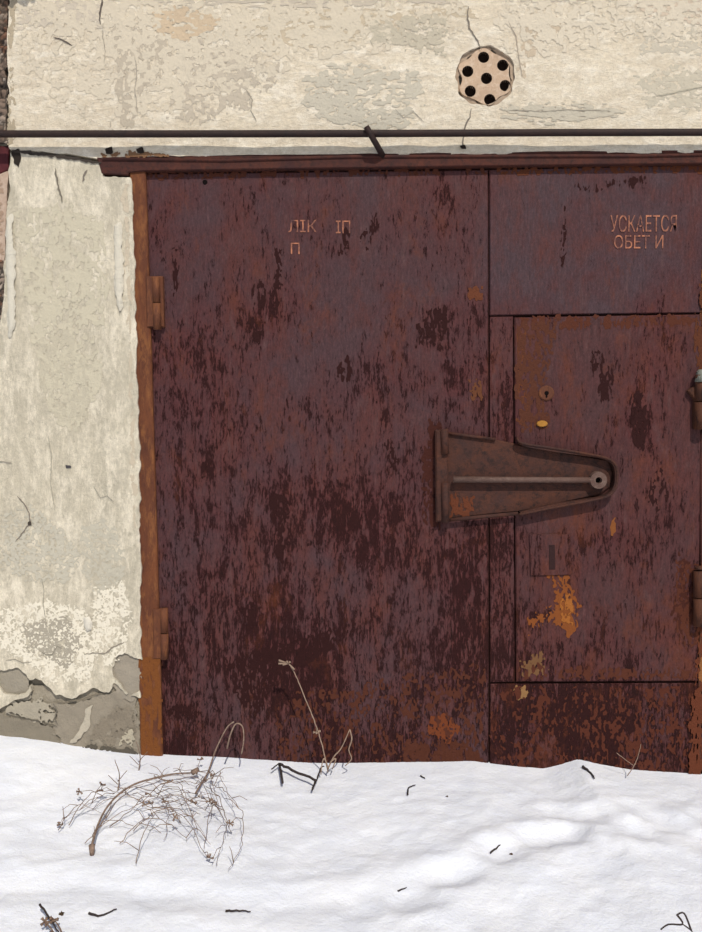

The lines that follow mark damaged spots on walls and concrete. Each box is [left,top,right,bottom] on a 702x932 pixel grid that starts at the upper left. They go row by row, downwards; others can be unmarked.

rust [147,169,440,181]
rust [451,165,702,176]
rust [421,418,442,531]
peeling [0,504,81,584]
peeling [0,580,142,754]
rust [138,656,163,756]
rust [272,552,702,775]